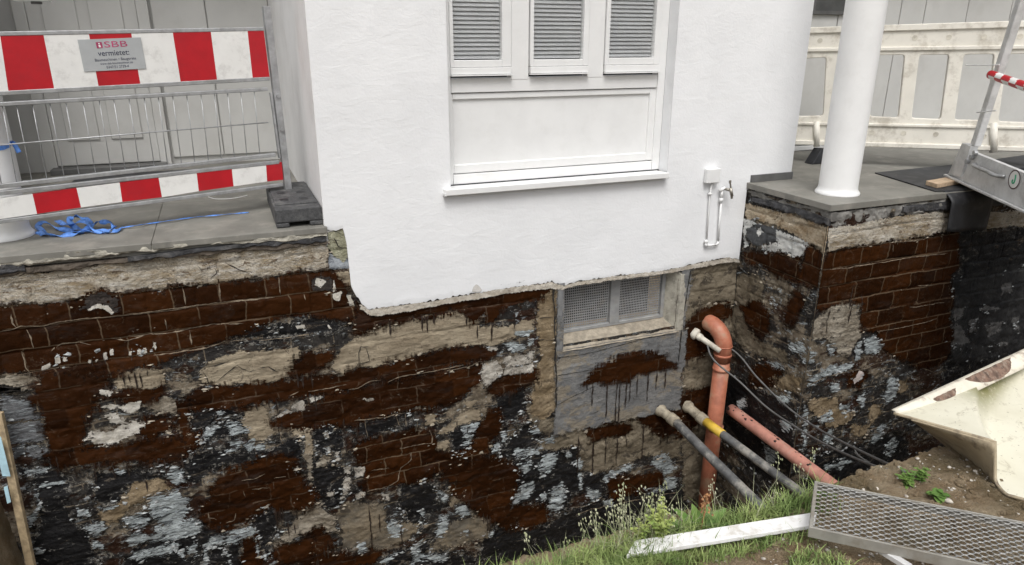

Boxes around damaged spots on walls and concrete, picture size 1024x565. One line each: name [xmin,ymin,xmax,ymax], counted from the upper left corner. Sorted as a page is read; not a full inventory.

spalling [987,199,1024,229]
leakage [0,267,555,535]
spalling [75,427,494,565]
spalling [0,200,951,528]
leakage [579,231,963,507]